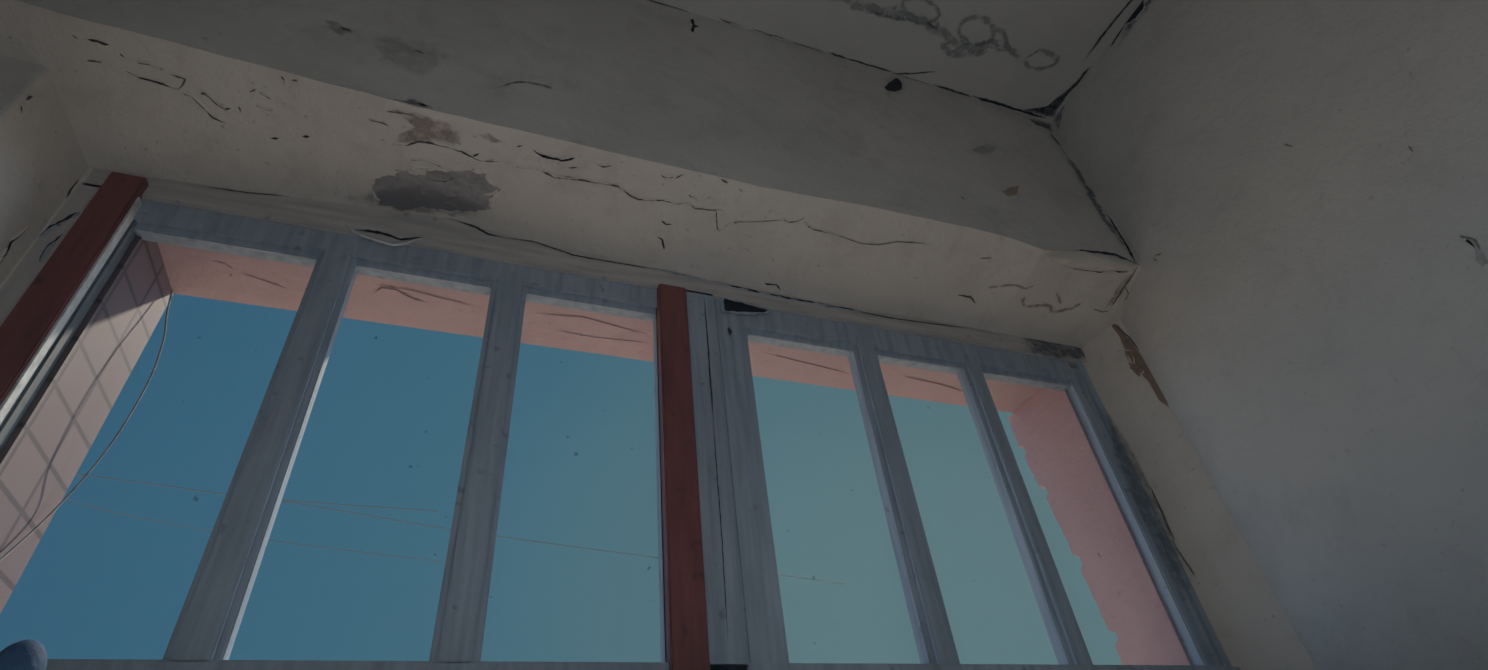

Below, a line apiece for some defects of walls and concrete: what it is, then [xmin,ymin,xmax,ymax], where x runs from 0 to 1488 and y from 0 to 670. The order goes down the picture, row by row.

water stain [848,0,1059,70]
crack [0,180,80,263]
crack [204,186,290,197]
peeling [345,224,421,246]
spalling [367,116,503,215]
crack [649,0,1151,262]
crack [368,111,963,635]
spalling [1094,253,1170,409]